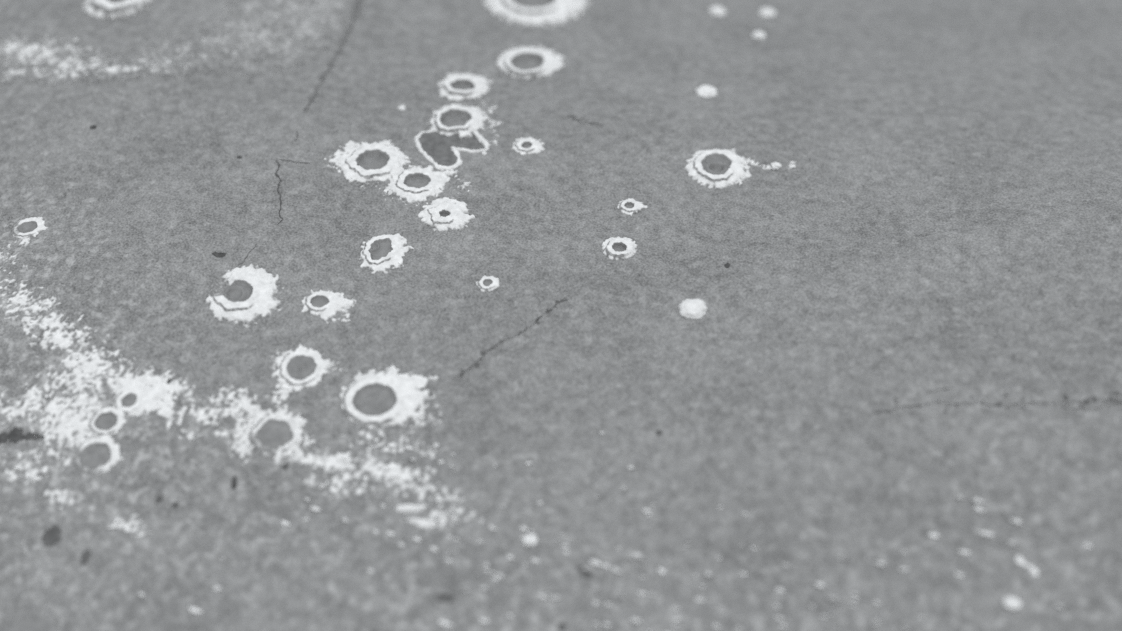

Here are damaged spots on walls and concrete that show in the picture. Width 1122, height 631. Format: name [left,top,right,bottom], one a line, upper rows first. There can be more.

crack [275,0,363,224]
damp [0,236,293,510]
crack [451,298,567,380]
damp [106,514,152,537]
damp [274,403,492,532]